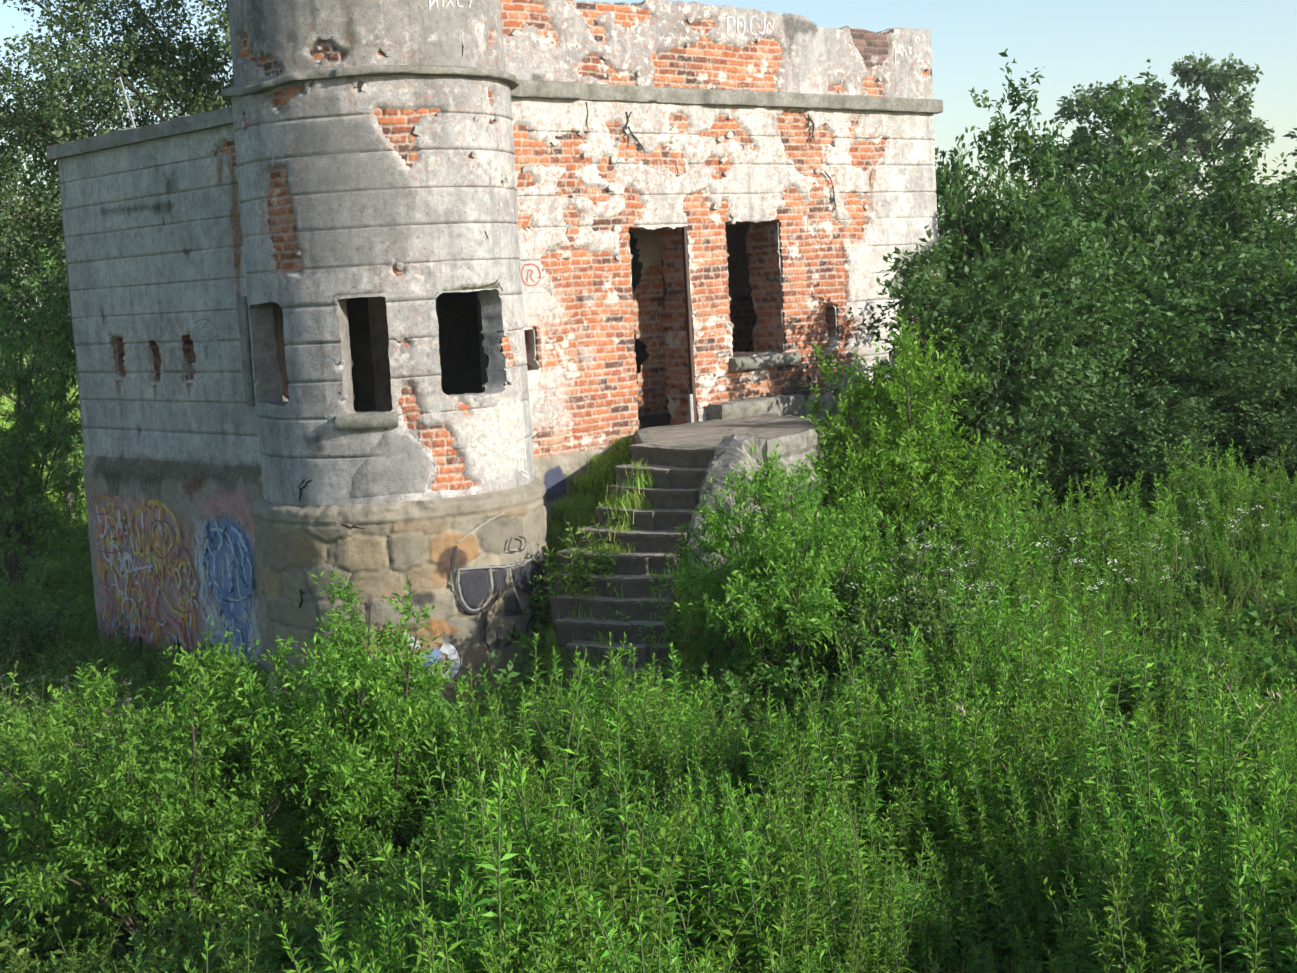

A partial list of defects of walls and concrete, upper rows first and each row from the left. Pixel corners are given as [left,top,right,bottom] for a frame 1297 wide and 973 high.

spalling [240,34,313,110]
spalling [310,33,346,65]
spalling [349,79,368,91]
spalling [377,45,394,57]
spalling [489,0,558,56]
spalling [566,0,783,92]
spalling [850,29,898,97]
spalling [374,108,444,168]
spalling [267,165,304,273]
spalling [473,91,885,458]
spalling [398,382,482,491]